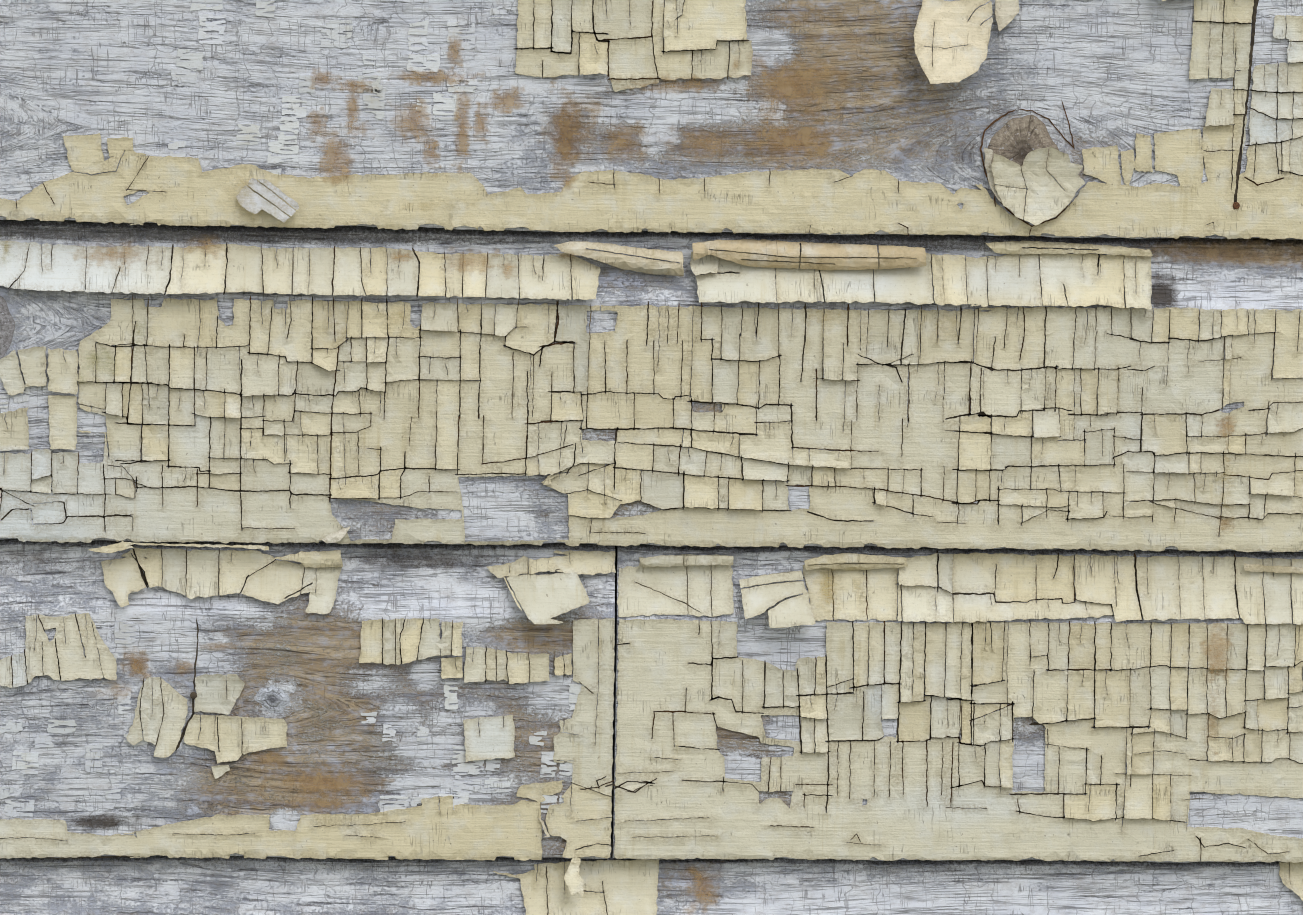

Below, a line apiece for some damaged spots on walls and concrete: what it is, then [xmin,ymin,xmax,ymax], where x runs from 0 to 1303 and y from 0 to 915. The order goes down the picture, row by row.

peeling [171,0,226,86]
peeling [255,1,275,17]
peeling [320,20,386,119]
peeling [407,20,477,125]
peeling [490,0,753,92]
peeling [995,0,1020,31]
crack [1189,0,1303,202]
peeling [0,75,1303,309]
peeling [0,346,77,451]
crack [0,295,1303,863]
peeling [0,544,816,915]
peeling [1196,836,1303,901]